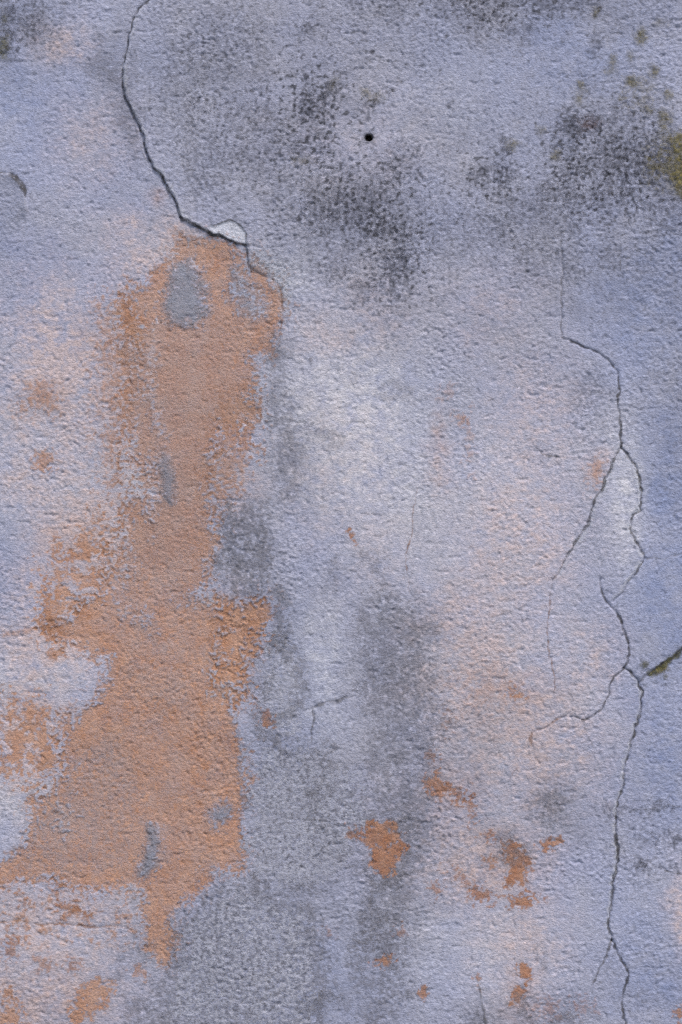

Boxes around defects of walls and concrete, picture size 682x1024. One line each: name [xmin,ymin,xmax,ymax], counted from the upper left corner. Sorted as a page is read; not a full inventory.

crack [122,2,248,254]
peeling [0,220,290,965]
crack [557,320,681,1024]
peeling [348,819,410,878]
peeling [467,832,564,910]
peeling [67,976,117,1024]